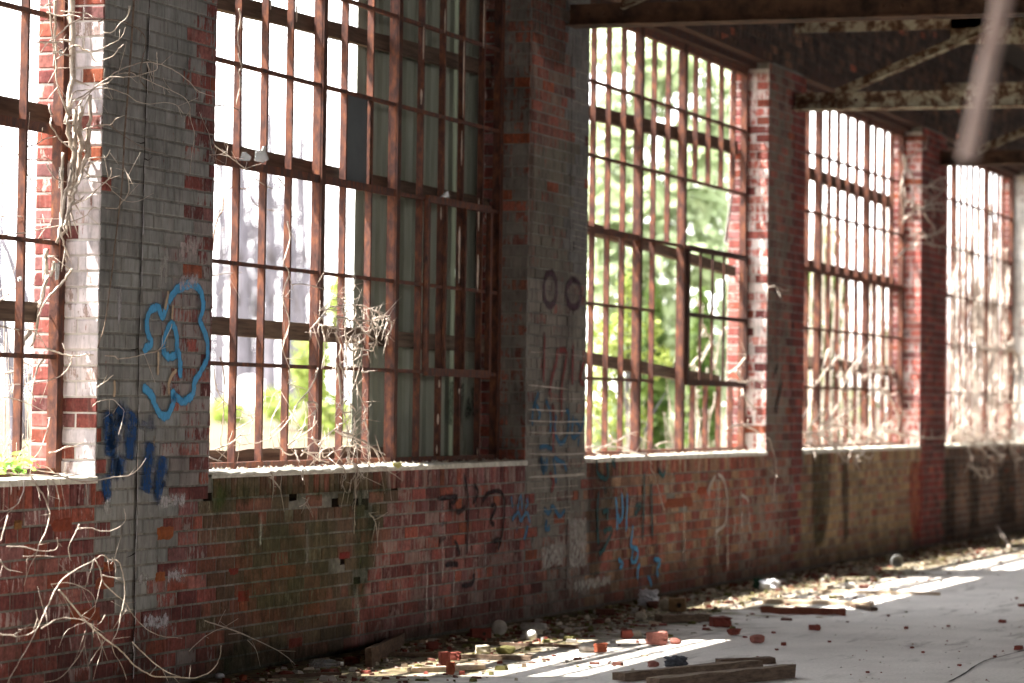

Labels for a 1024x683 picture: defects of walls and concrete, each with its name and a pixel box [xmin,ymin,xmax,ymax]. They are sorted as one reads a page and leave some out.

crack [124,0,151,683]